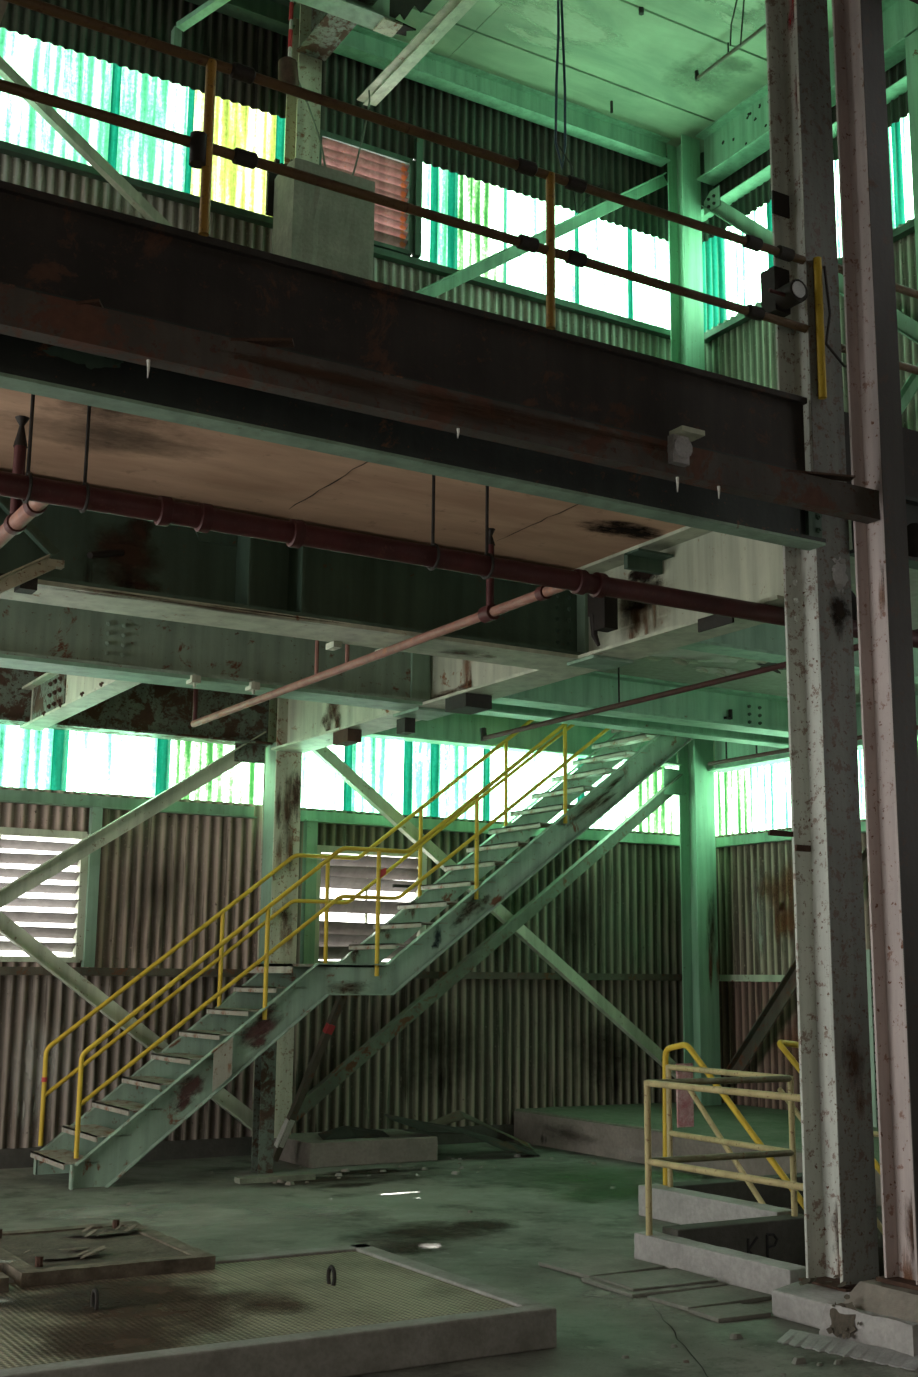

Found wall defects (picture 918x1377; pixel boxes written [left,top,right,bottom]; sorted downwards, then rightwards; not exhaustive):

rust [321,703,340,731]
rust [276,776,300,867]
leakage [356,1221,510,1254]
leakage [0,1281,304,1359]